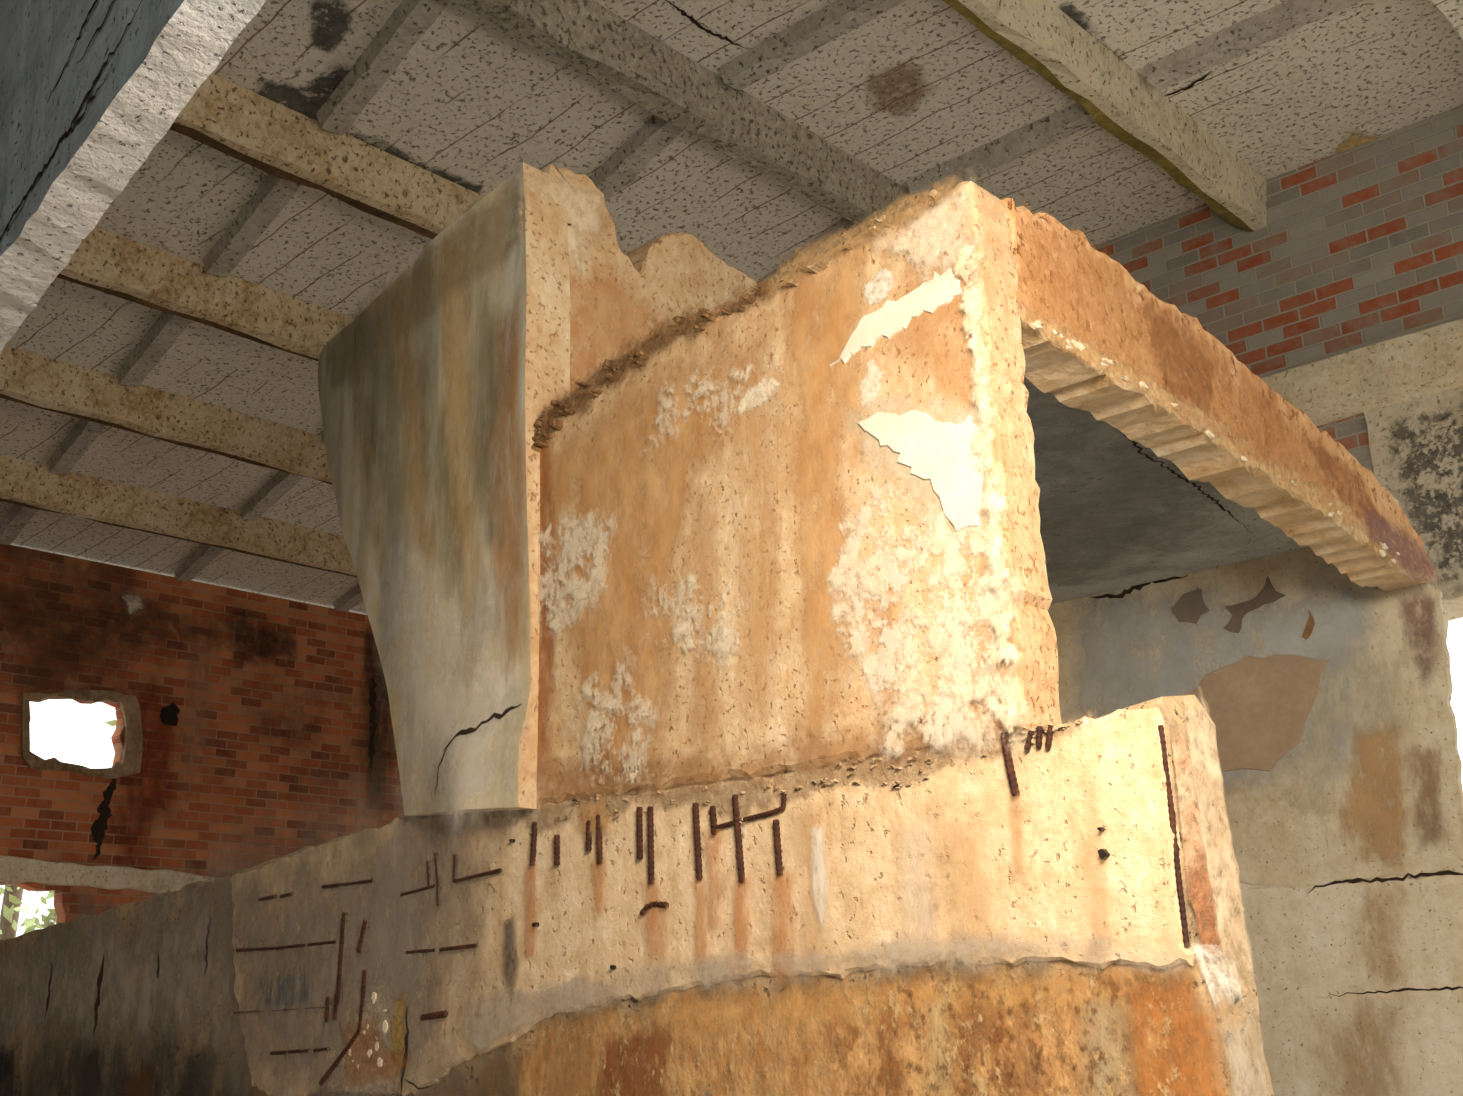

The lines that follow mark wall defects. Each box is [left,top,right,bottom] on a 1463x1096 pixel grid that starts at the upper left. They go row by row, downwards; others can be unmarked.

water stain [311,0,352,52]
crack [665,0,744,48]
crack [0,0,142,240]
water stain [257,67,351,122]
water stain [1392,413,1463,580]
peeling [484,179,1091,972]
peeling [1171,576,1286,633]
peeling [1181,611,1330,772]
crack [435,704,521,794]
crack [91,778,117,860]
water stain [0,563,513,1096]
crack [1307,870,1463,894]